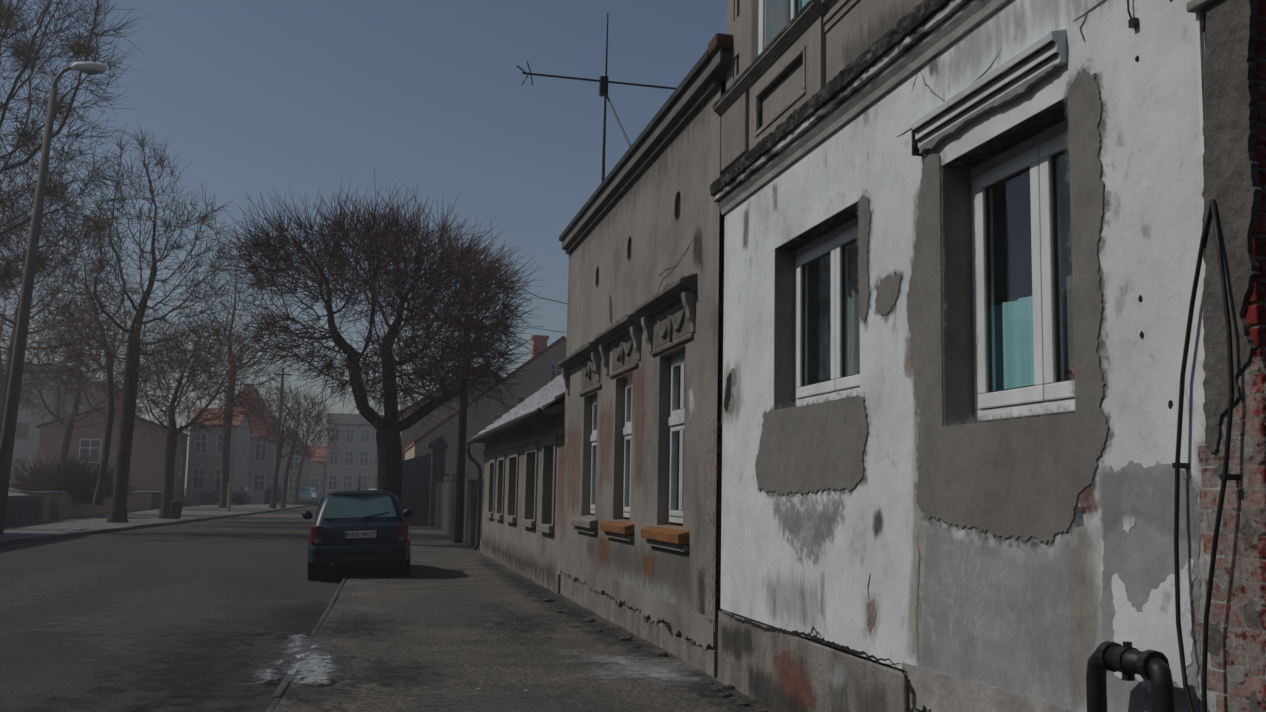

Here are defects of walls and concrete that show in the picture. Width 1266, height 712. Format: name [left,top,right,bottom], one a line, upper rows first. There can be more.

leakage [481,539,806,712]
crack [718,536,921,712]
peeling [1080,460,1203,712]